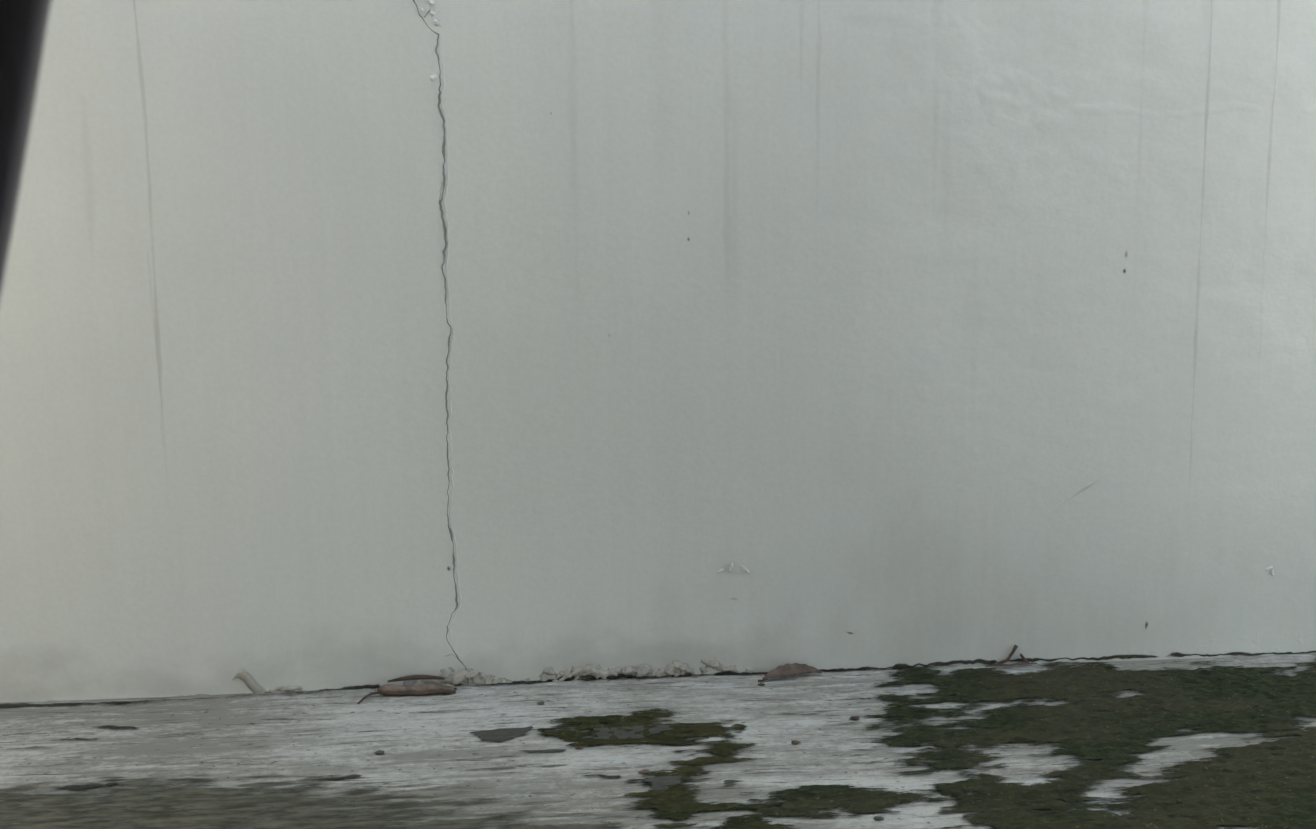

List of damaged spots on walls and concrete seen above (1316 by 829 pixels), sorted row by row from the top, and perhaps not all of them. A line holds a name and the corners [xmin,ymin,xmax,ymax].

crack [413,0,768,686]
crack [820,651,1316,672]
crack [248,685,380,696]
crack [0,695,202,740]